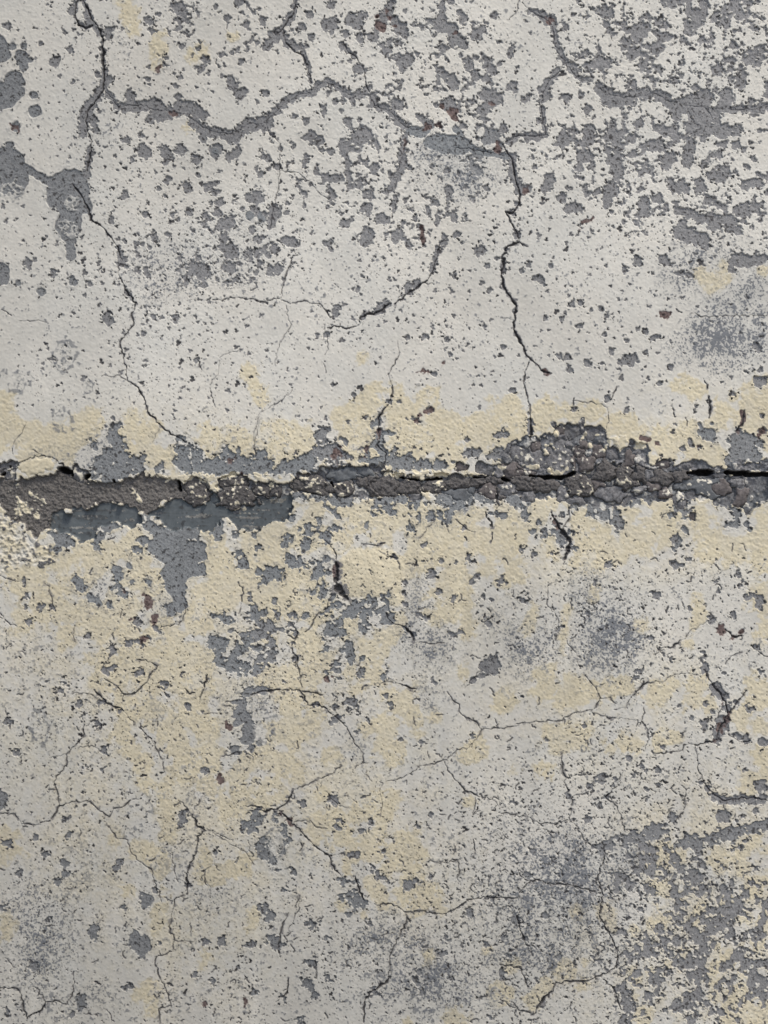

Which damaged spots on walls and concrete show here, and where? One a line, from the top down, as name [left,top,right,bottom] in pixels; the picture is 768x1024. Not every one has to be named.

crack [72,0,445,443]
peeling [0,0,768,299]
spalling [0,407,768,758]
crack [375,343,443,481]
peeling [543,300,665,374]
crack [456,0,768,442]
crack [686,469,768,478]
peeling [743,342,768,390]
crack [0,659,255,1024]
peeling [324,792,374,835]
crack [245,471,768,1024]
peeling [582,766,768,1024]